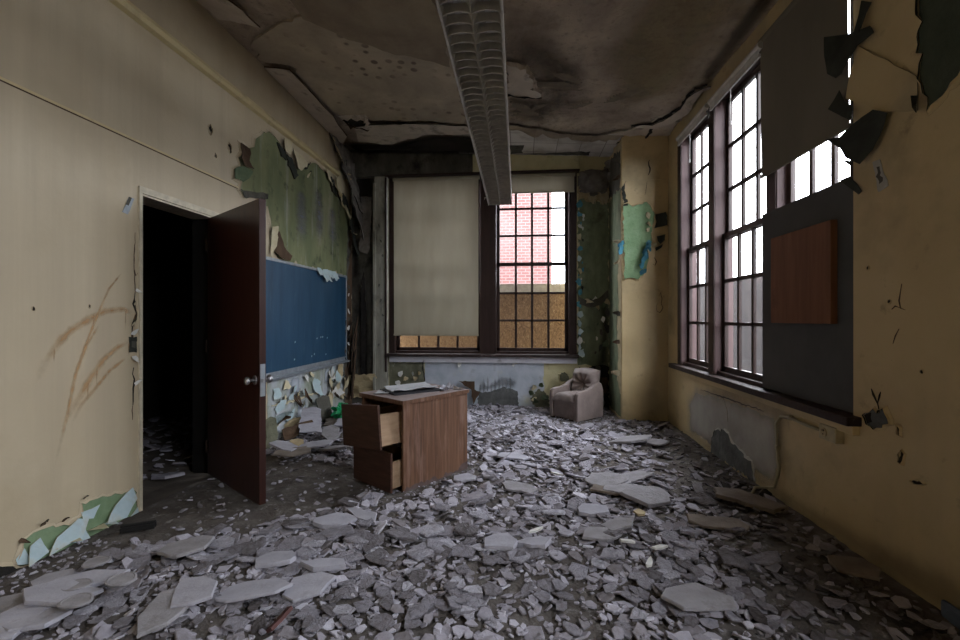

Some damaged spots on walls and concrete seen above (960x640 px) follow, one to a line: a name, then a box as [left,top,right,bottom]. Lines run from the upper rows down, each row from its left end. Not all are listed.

peeling [824,0,960,194]
peeling [214,129,364,439]
peeling [509,125,667,417]
corrosion [54,309,123,411]
peeling [389,362,550,407]
flaking render [690,393,776,482]
flaking render [862,389,907,466]
peeling [0,488,139,578]